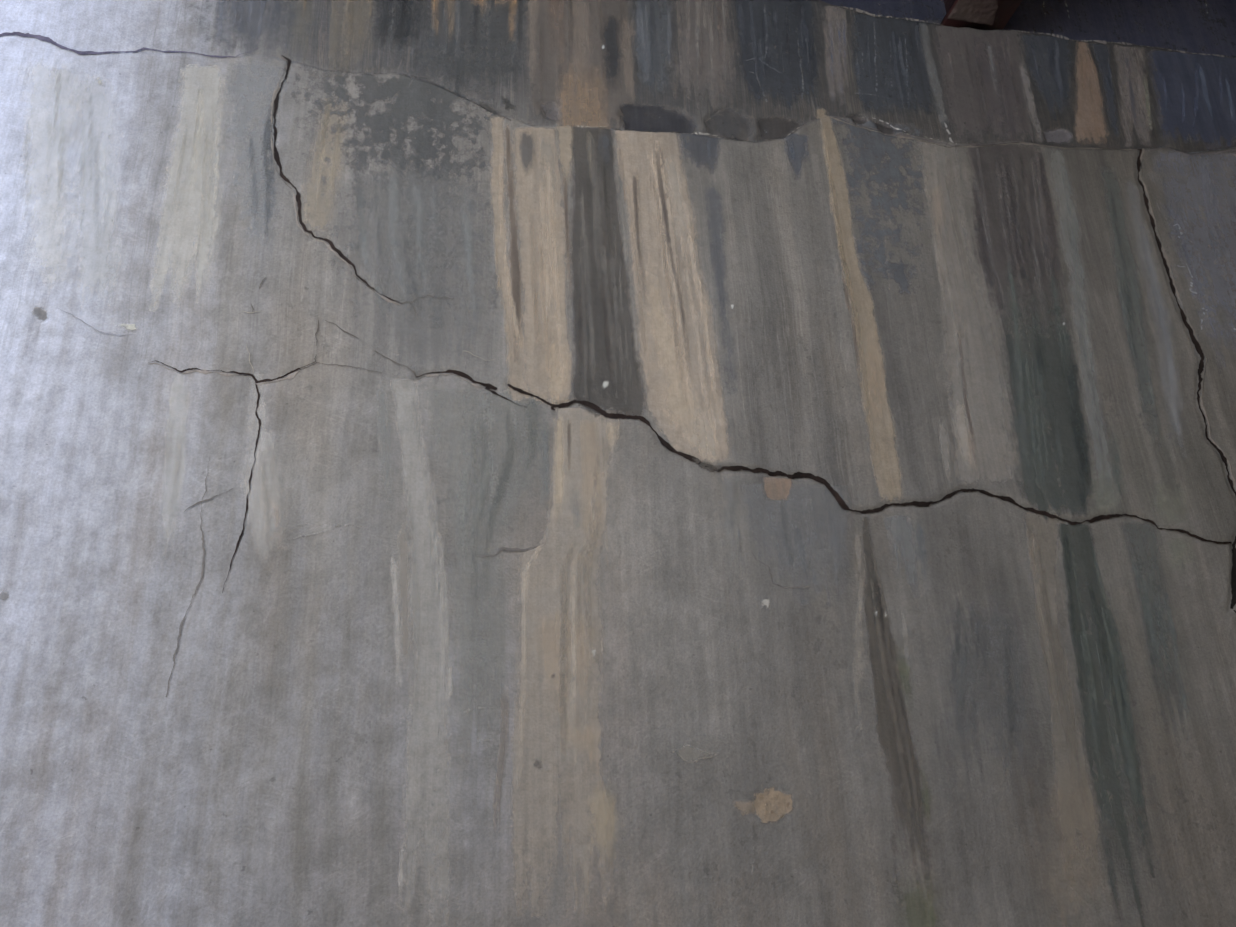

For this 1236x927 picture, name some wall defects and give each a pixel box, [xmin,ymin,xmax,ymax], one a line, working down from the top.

crack [60,309,136,336]
crack [0,32,511,319]
water stain [735,0,1114,504]
crack [831,116,1236,496]
water stain [1003,0,1236,150]
crack [150,320,1236,697]
water stain [746,485,846,601]
peeling [754,788,793,823]
water stain [862,517,930,879]